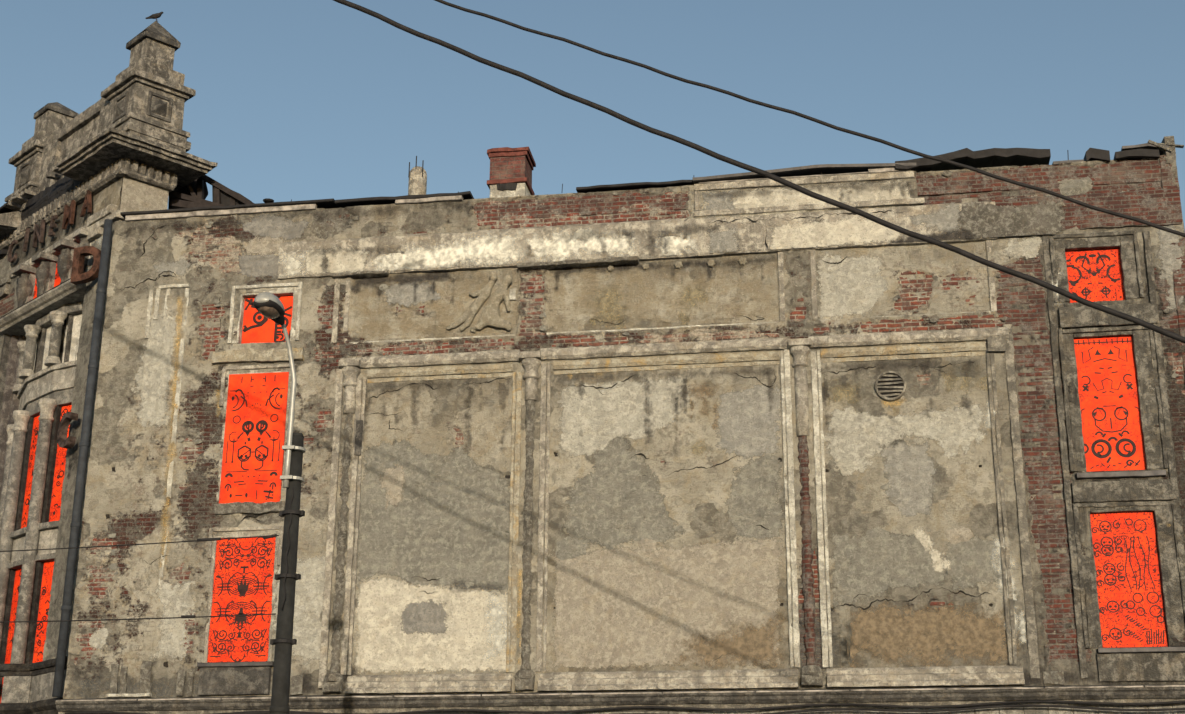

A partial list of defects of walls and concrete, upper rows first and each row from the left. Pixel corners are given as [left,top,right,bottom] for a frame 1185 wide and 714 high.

flaking render [474,192,691,229]
spalling [910,159,1162,239]
flaking render [153,221,241,281]
flaking render [198,299,225,360]
flaking render [1154,268,1185,395]
peeling [356,426,516,591]
peeling [563,434,686,550]
peeling [725,453,785,544]
flaking render [860,256,1092,663]
flaking render [85,533,119,599]
flaking render [169,563,191,584]
flaking render [74,617,107,665]